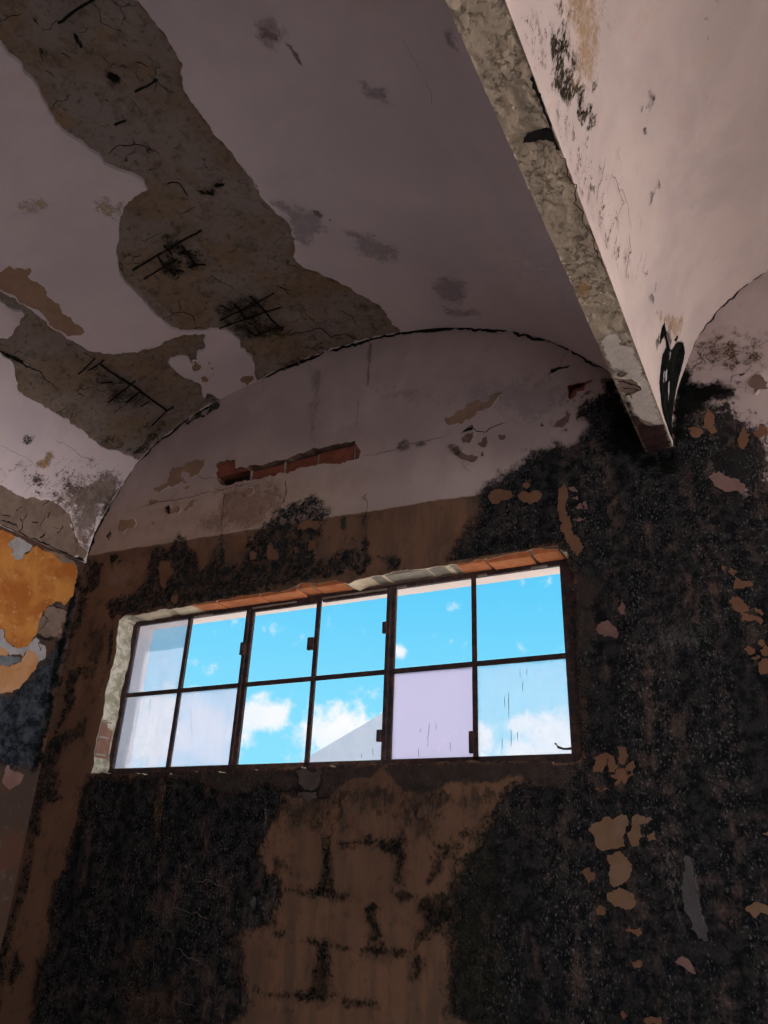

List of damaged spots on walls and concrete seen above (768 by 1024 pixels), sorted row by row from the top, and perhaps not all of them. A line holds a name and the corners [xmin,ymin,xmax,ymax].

leakage [524,0,620,259]
spalling [0,0,400,460]
crack [263,328,608,381]
crack [0,403,249,573]
flaking render [148,445,361,516]
crack [363,436,461,456]
flaking render [371,482,588,584]
peeling [709,471,745,493]
peeling [0,530,78,694]
flaking render [193,580,353,611]
leakage [0,332,768,1024]
peeling [589,814,656,916]